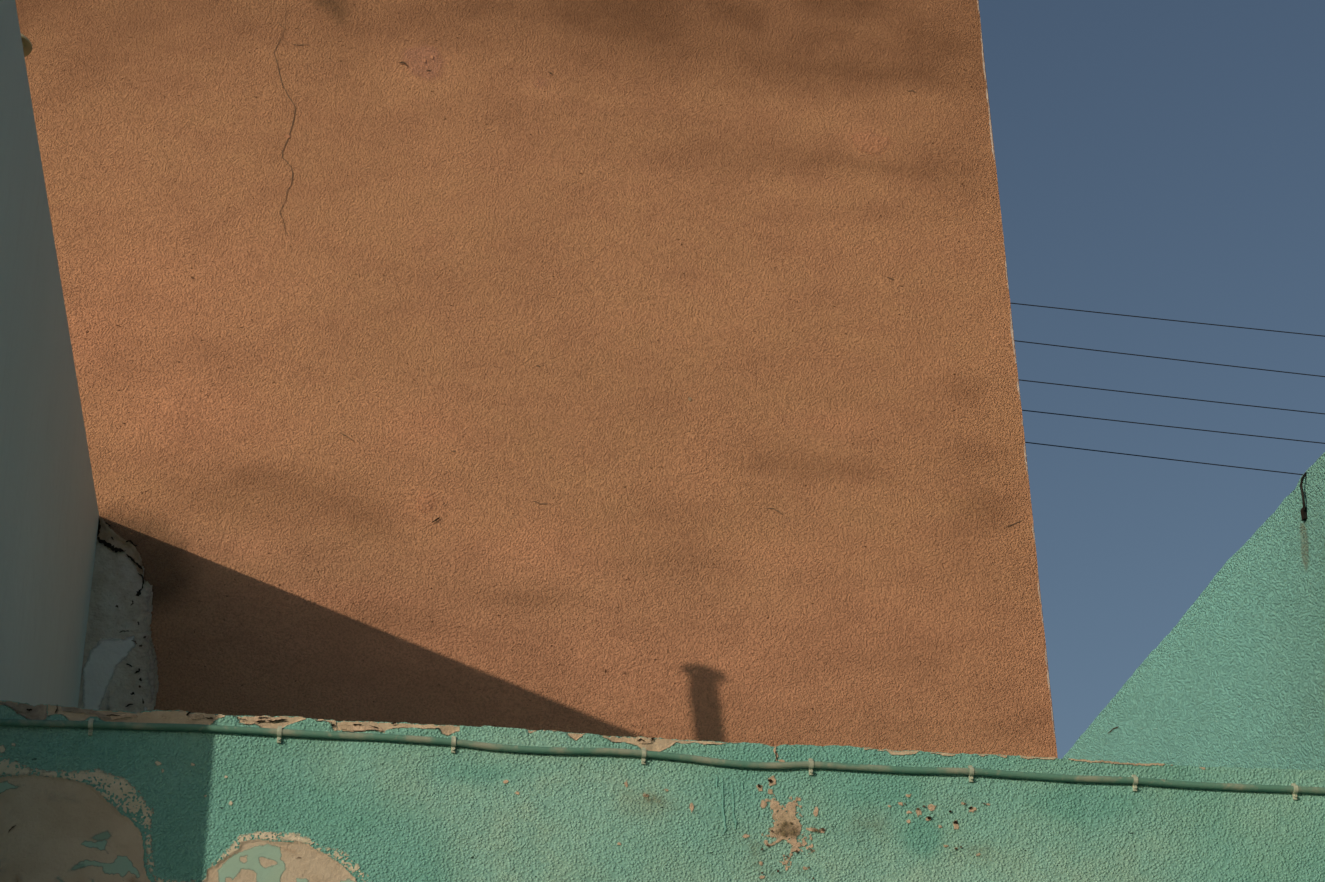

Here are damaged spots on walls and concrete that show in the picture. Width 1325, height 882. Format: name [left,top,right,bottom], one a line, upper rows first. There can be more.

crack [274,7,306,236]
spalling [0,516,460,735]
spalling [0,743,368,882]
peeling [742,775,825,879]
peeling [888,794,990,829]